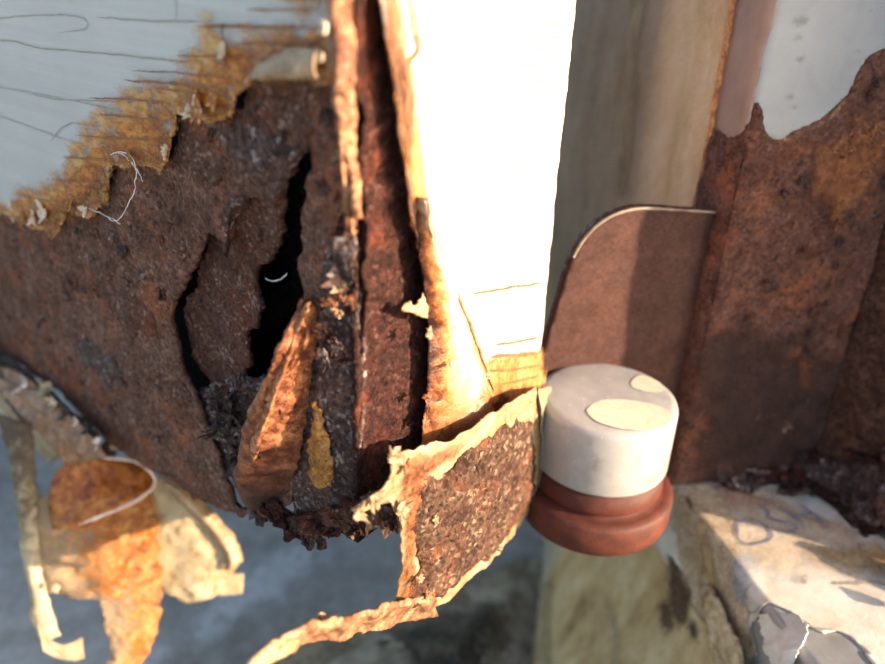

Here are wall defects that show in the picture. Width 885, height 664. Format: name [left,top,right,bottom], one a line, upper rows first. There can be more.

crack [0,1,319,160]
peeling [180,90,216,124]
peeling [243,46,324,90]
peeling [317,21,328,35]
peeling [4,198,87,238]
corrosion [0,0,444,551]
spalling [248,151,312,377]
corrosion [666,0,885,575]
peeling [194,364,242,480]
peeling [247,386,552,664]
corrosion [660,556,697,638]
peeling [757,613,809,664]